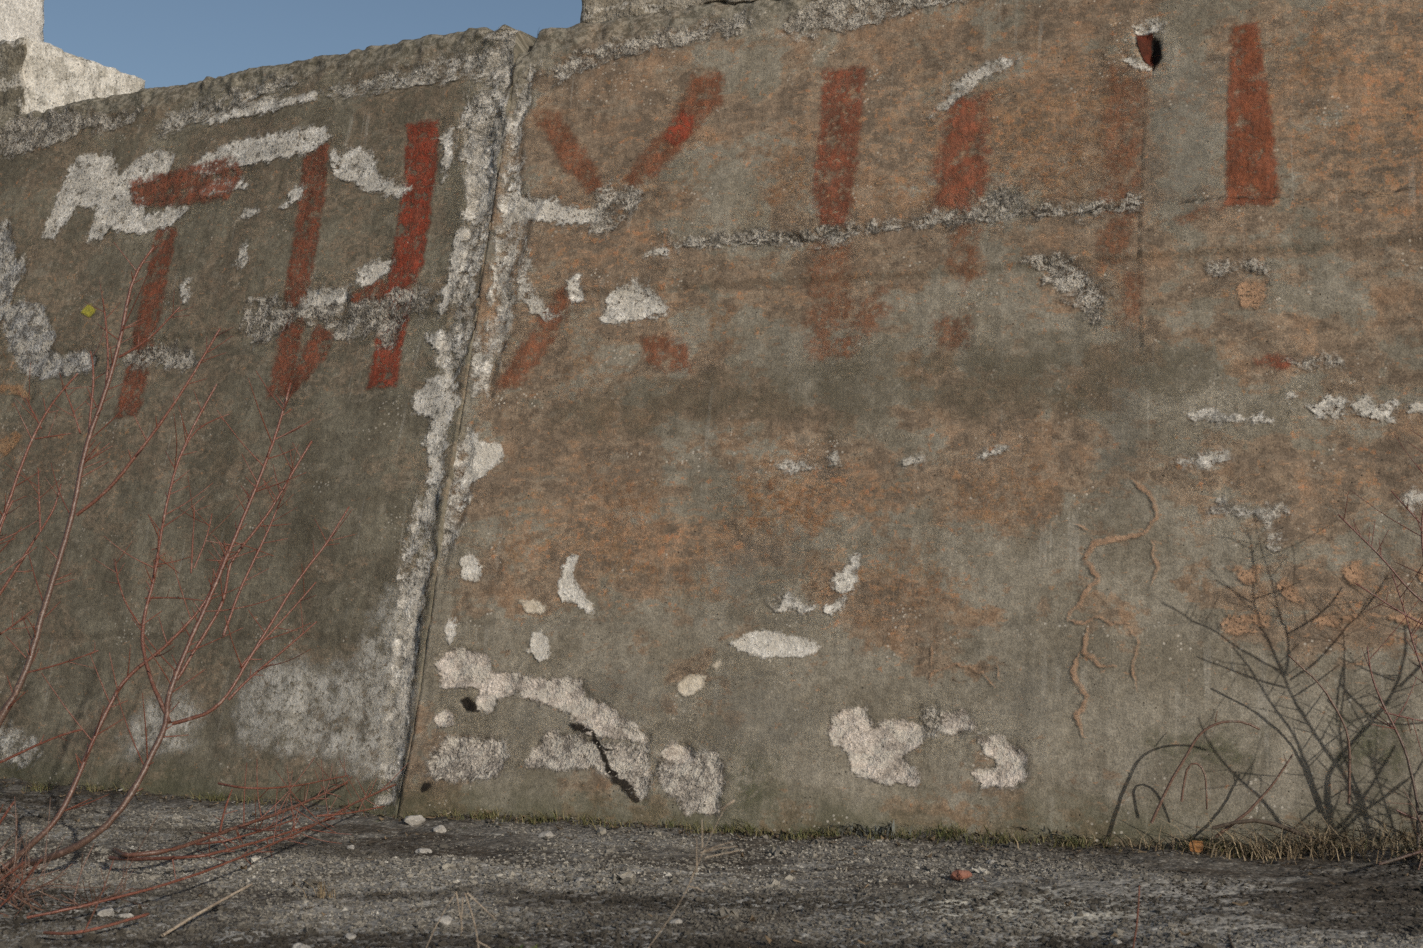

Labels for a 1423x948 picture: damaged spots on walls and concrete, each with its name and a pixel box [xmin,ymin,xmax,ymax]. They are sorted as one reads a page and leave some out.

spalling [1124,17,1165,71]
crack [569,722,640,803]